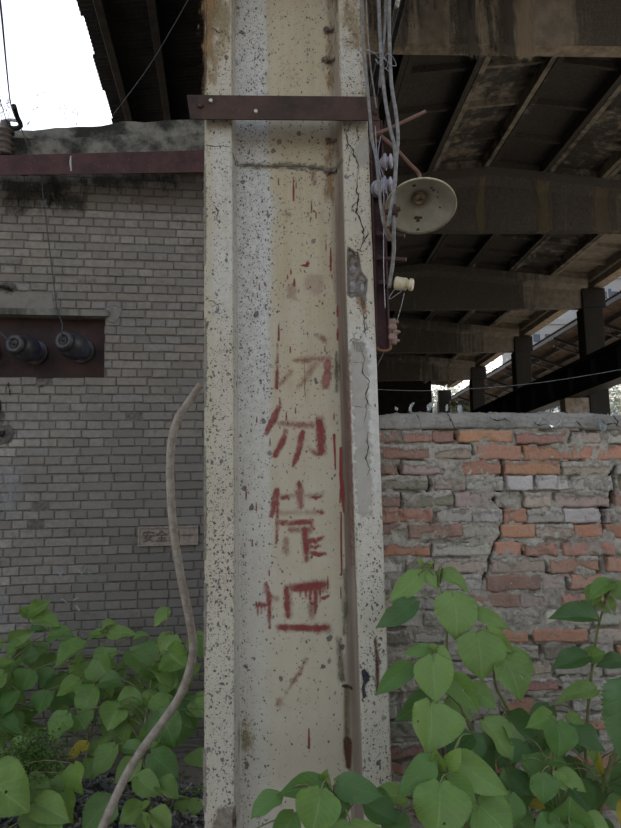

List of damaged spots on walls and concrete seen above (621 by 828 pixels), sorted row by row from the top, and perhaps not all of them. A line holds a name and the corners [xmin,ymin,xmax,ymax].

corrosion [201,0,218,85]
damp [449,0,533,61]
damp [3,173,176,211]
crack [346,122,369,251]
spalling [347,247,368,315]
crack [350,315,370,475]